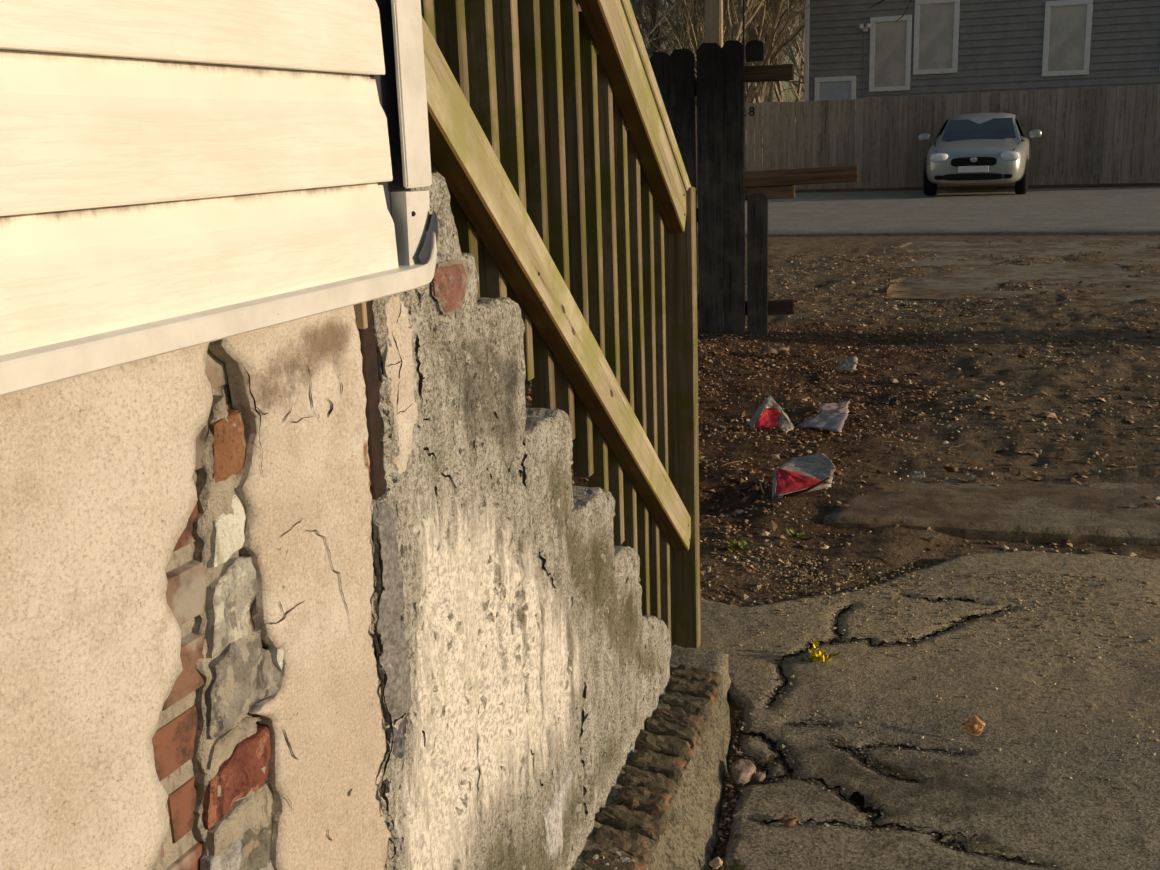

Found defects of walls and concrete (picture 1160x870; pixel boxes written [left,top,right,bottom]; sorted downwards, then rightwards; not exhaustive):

crack [244,365,343,474]
flaking render [192,395,284,870]
crack [270,601,305,624]
crack [282,503,426,870]
crack [539,552,555,588]
crack [579,678,589,827]